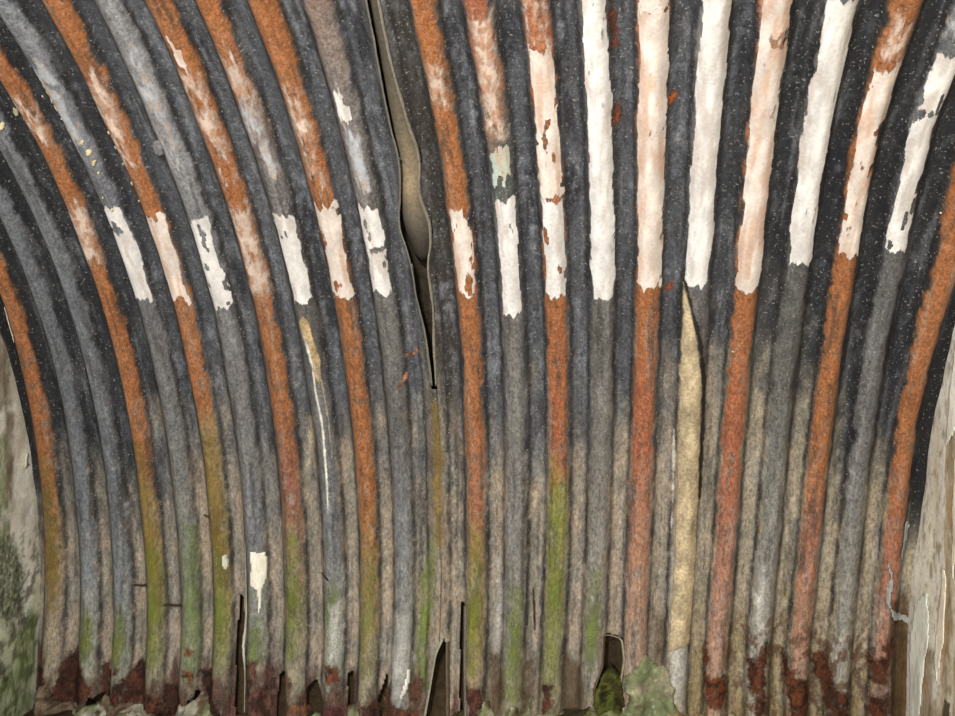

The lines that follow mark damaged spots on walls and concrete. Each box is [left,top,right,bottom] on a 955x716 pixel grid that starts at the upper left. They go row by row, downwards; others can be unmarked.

peeling [582,0,616,301]
peeling [636,0,670,293]
peeling [735,0,793,295]
peeling [789,0,859,266]
peeling [885,53,955,254]
leakage [0,339,13,512]
leakage [0,531,33,716]
corrosion [36,646,218,716]
corrosion [246,662,309,716]
corrosion [702,643,729,710]
corrosion [746,641,849,716]
corrosion [866,639,895,716]